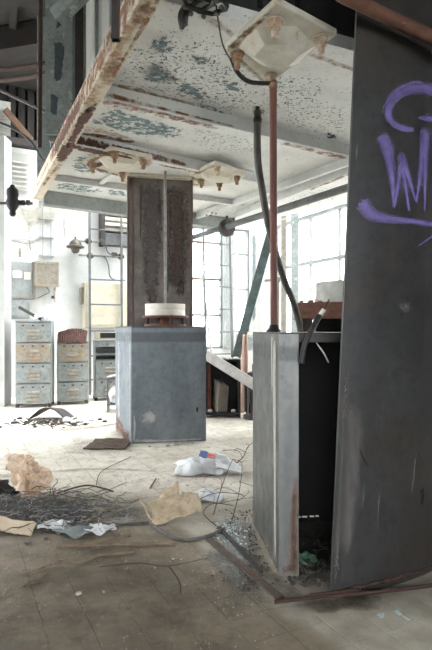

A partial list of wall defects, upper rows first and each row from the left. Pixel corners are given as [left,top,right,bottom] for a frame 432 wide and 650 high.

rust [228,20,262,49]
peeling [118,28,268,115]
rust [38,0,233,186]
peeling [92,109,183,139]
peeling [72,154,104,174]